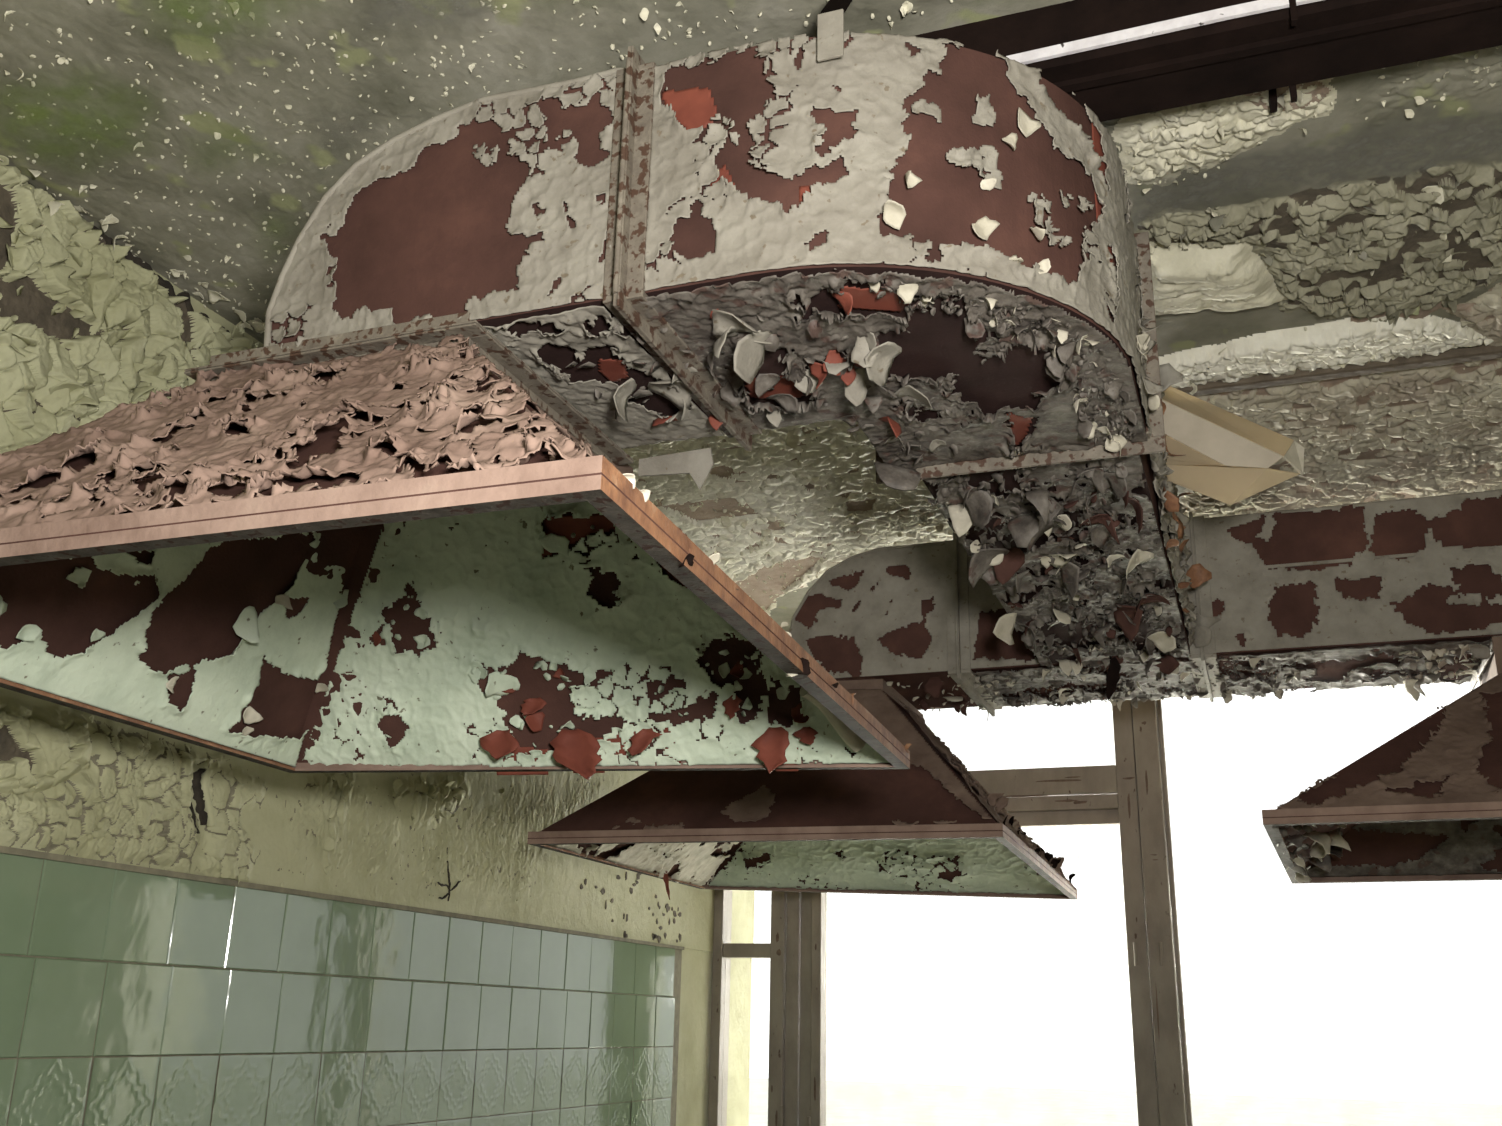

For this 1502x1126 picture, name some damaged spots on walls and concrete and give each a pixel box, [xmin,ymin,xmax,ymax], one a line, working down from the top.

peeling [0,73,619,451]
peeling [613,30,1502,723]
peeling [16,624,43,641]
peeling [91,628,106,642]
peeling [233,606,260,643]
peeling [413,607,430,649]
peeling [468,660,520,697]
corrosion [786,657,811,677]
peeling [242,706,263,739]
peeling [509,712,575,732]
peeling [988,793,1076,883]
peeling [1283,824,1351,883]